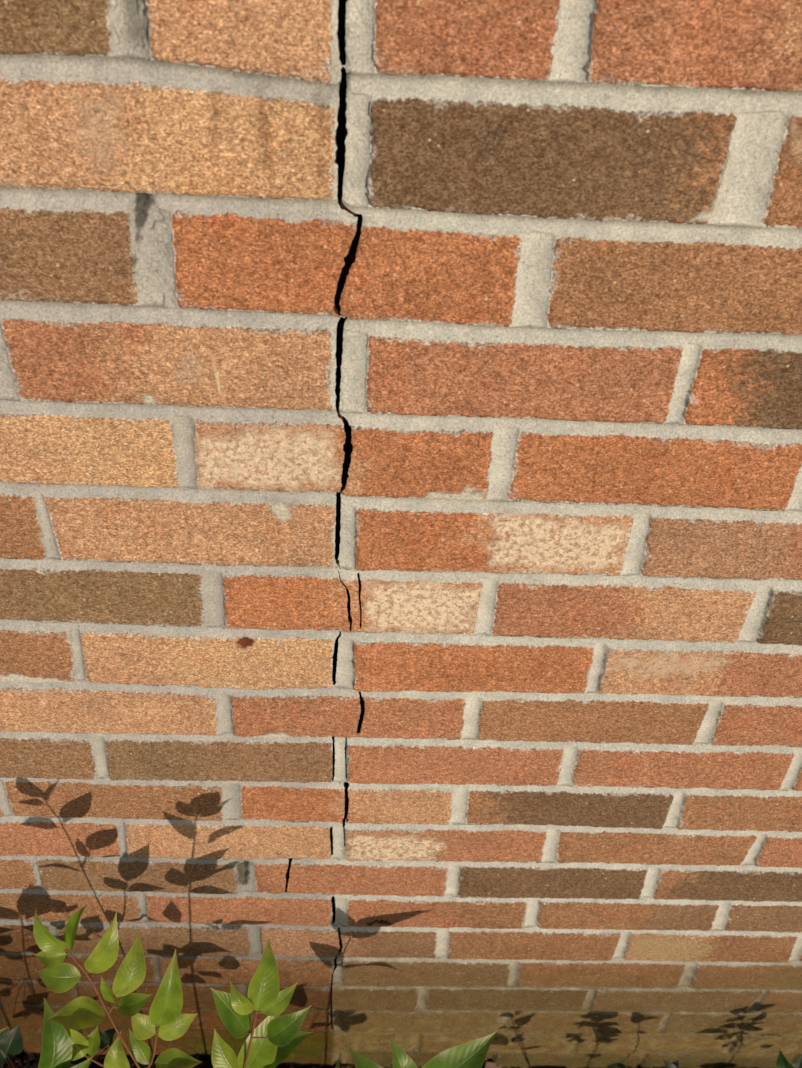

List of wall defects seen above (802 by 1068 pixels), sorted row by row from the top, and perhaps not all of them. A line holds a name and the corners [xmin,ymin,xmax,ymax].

crack [330,0,365,842]
crack [330,897,343,1022]